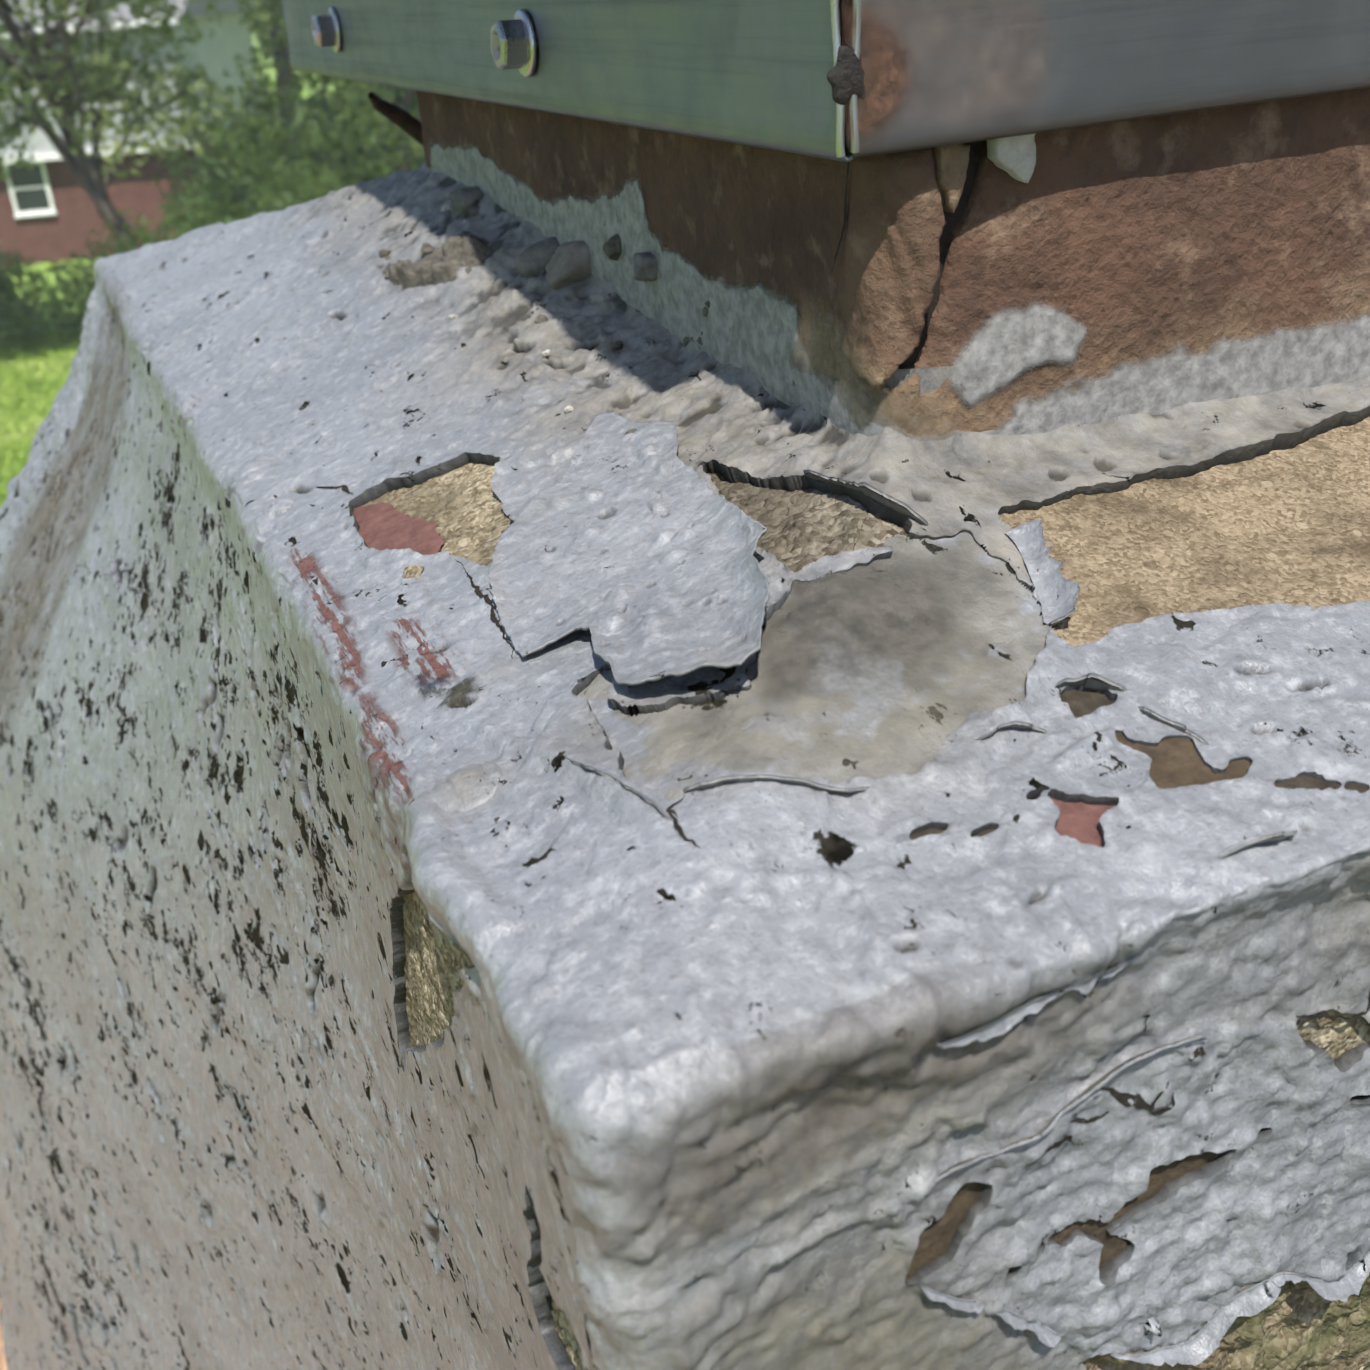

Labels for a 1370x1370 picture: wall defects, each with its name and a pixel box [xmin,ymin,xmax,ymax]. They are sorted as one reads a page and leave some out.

crack [831,161,850,272]
crack [898,140,985,369]
peeling [353,412,1370,824]
spalling [402,890,474,1047]
peeling [935,1035,1207,1182]
peeling [919,1283,1062,1347]
flaking render [1082,1251,1370,1370]